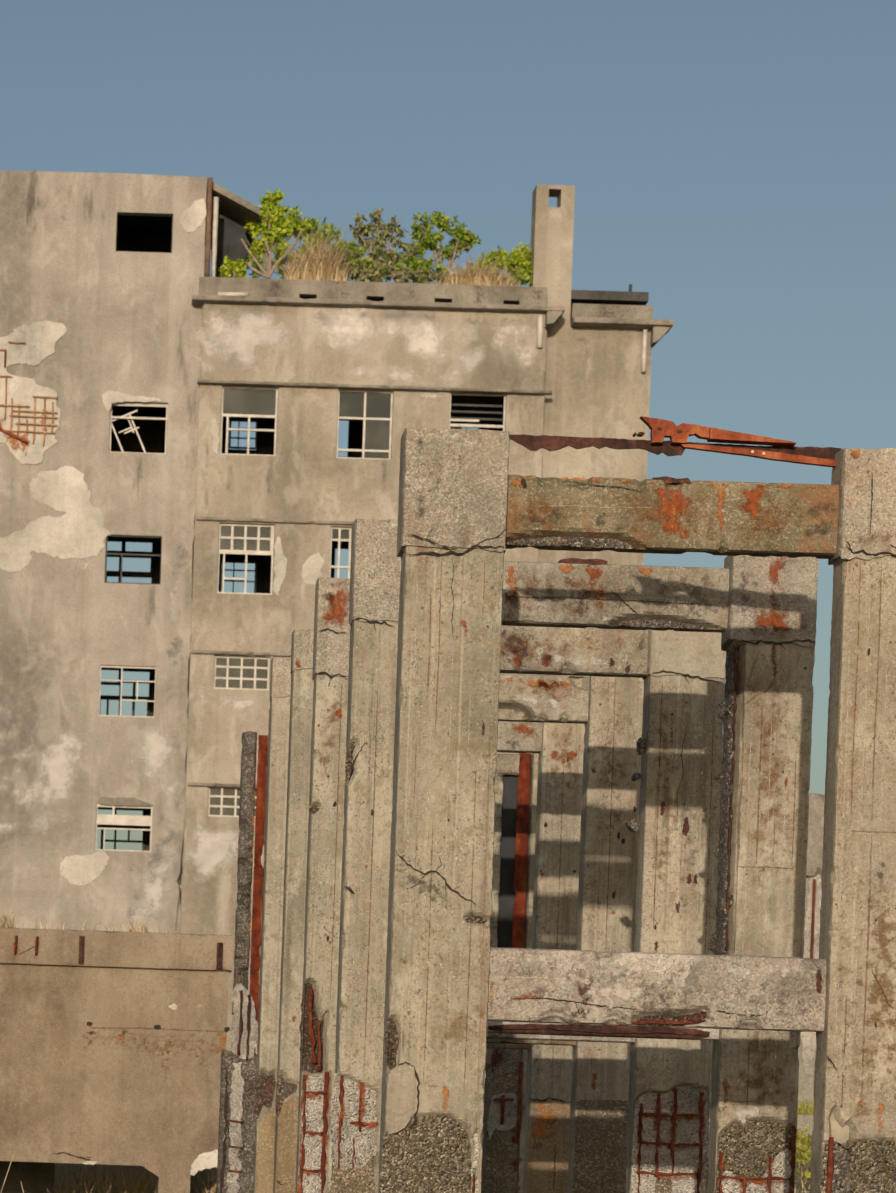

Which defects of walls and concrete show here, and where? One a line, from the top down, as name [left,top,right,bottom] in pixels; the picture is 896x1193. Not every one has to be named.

efflorescence [201,314,284,365]
damp [315,308,484,381]
spalling [0,321,110,577]
corrosion [636,476,725,538]
corrosion [751,558,805,675]
flaking render [59,851,110,886]
crack [395,850,476,905]
spalling [190,983,797,1193]
spalling [819,1113,896,1193]